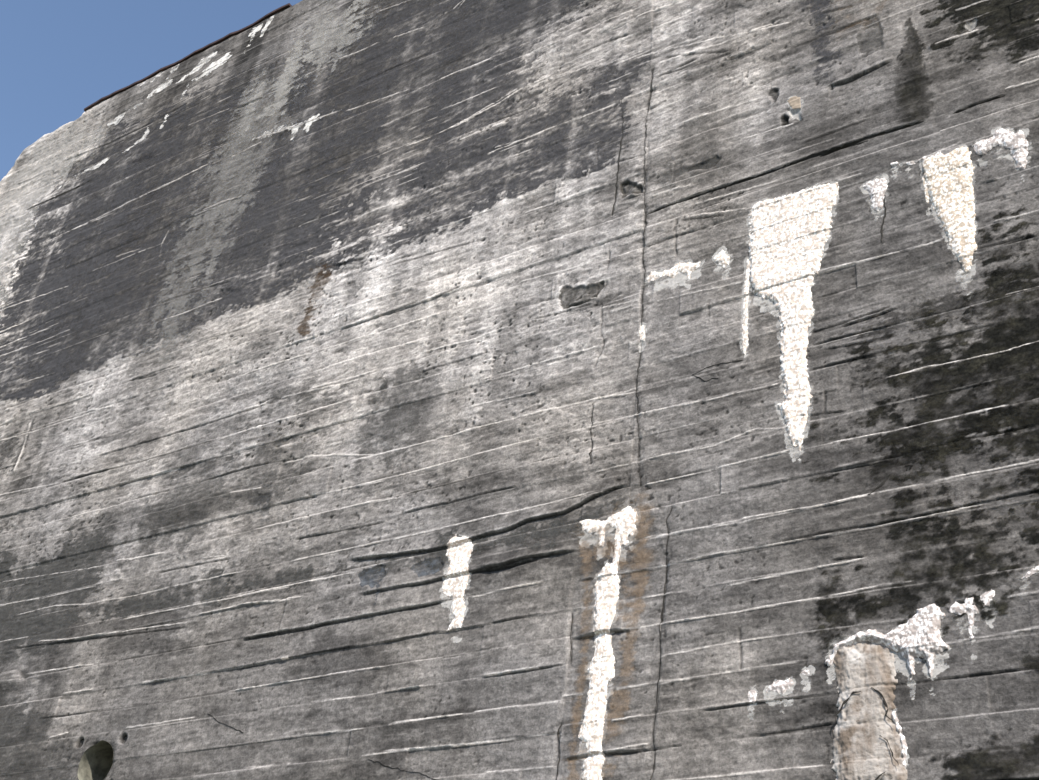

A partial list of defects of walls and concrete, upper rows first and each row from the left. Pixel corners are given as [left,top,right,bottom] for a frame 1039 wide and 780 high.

leakage [0,0,651,401]
spalling [559,282,605,309]
leakage [647,262,701,282]
leakage [713,249,730,268]
crack [612,69,924,486]
leakage [742,182,839,463]
leakage [810,128,1039,650]
crack [953,95,1005,114]
leakage [0,486,639,780]
crack [650,509,672,780]
leakage [748,670,810,703]
leakage [933,735,1039,780]